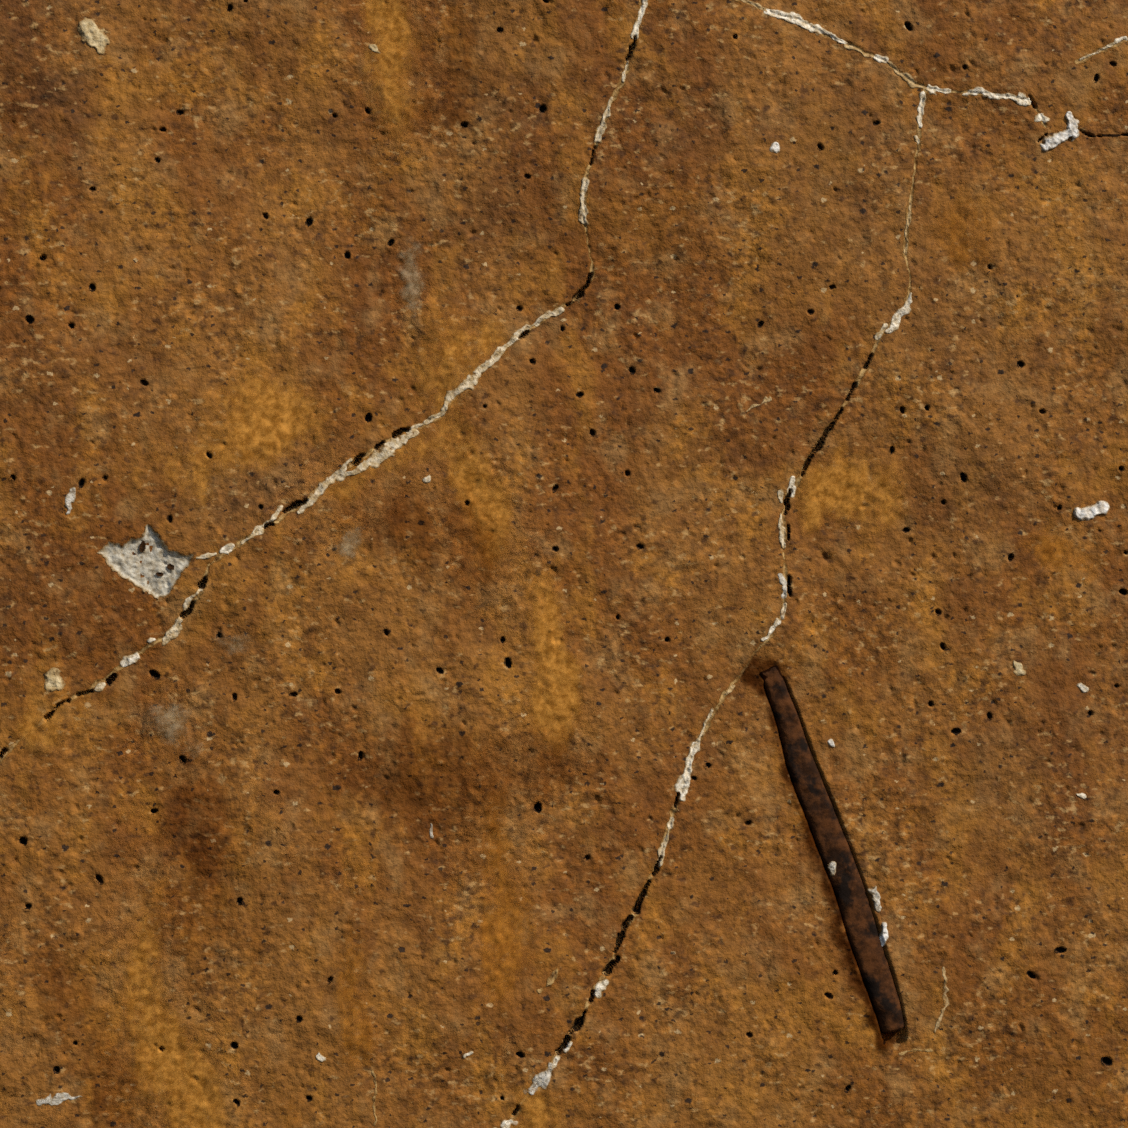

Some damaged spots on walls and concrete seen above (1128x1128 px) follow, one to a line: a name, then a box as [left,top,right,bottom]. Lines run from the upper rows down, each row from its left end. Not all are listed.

crack [1074,36,1128,65]
crack [1078,129,1128,137]
spalling [97,524,194,599]
crack [0,0,648,764]
crack [493,0,1050,1128]
corrosion [742,658,904,1049]